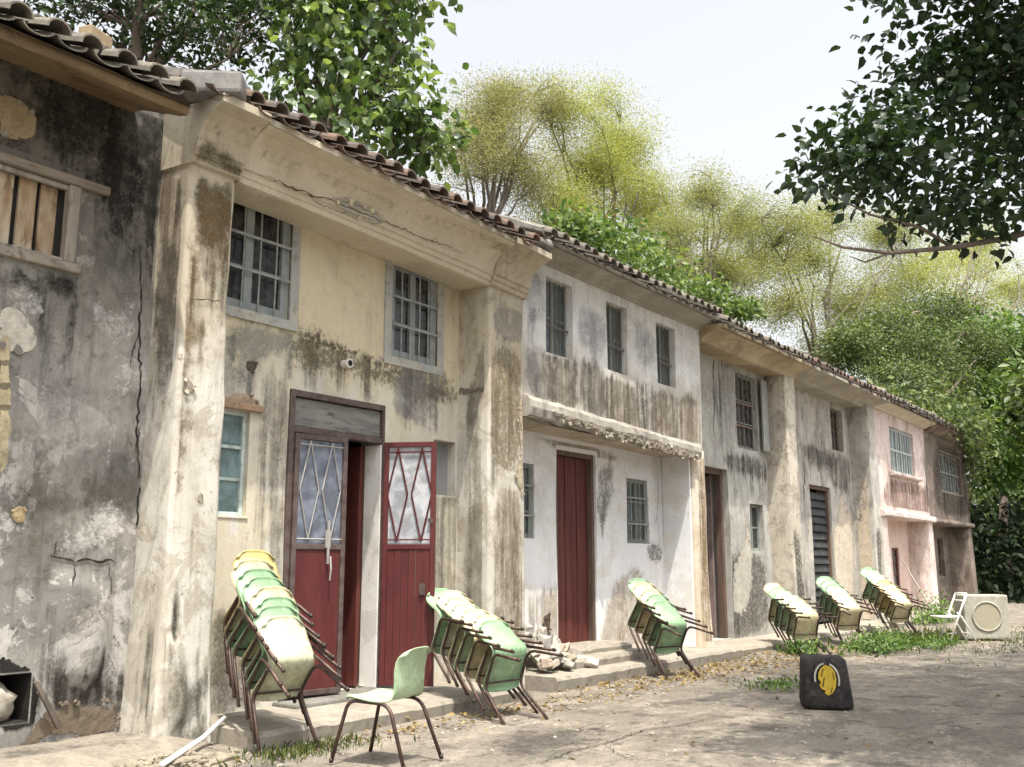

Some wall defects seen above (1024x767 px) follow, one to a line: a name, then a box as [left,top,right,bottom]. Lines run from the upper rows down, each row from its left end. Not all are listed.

flaking render [0,94,37,140]
damp [0,60,181,398]
crack [259,175,465,253]
flaking render [0,306,37,473]
crack [50,244,143,593]
damp [226,308,683,609]
spalling [552,409,699,461]
damp [495,491,522,638]
damp [732,554,769,636]